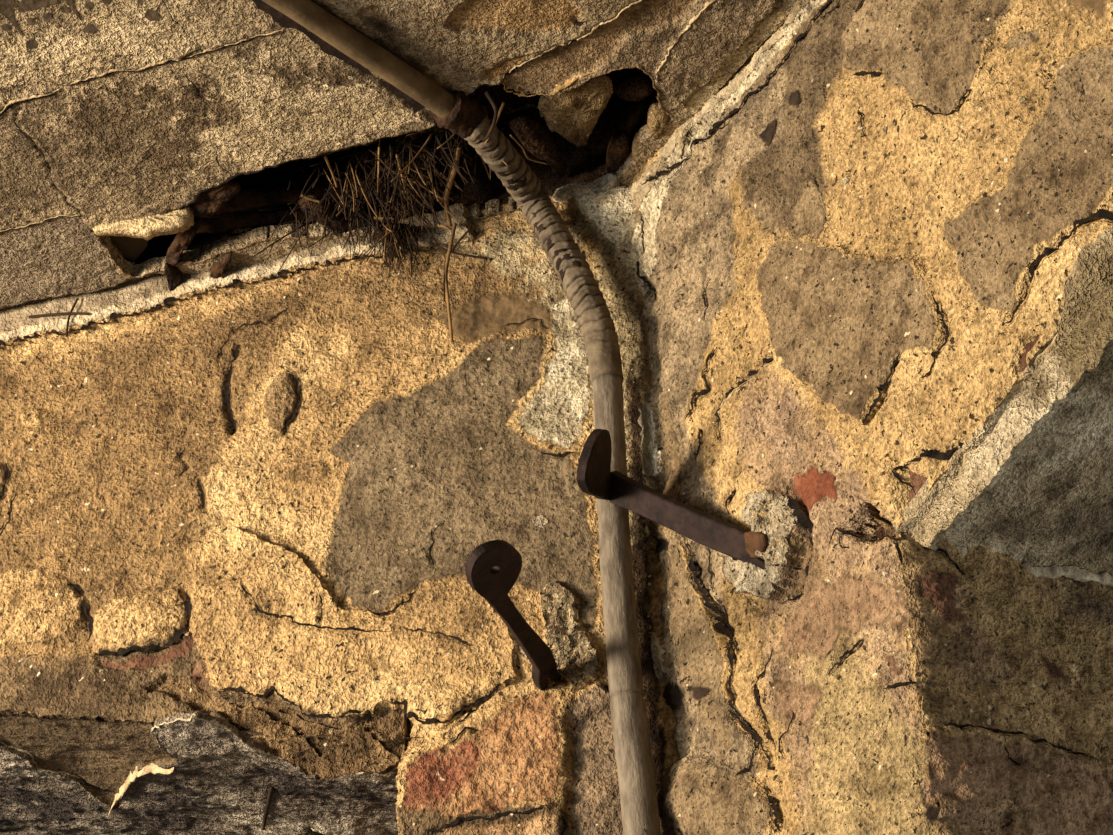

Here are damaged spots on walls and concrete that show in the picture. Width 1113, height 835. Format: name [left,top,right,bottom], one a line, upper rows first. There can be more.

crack [0,0,283,232]
hole [164,123,449,219]
flaking render [756,177,936,420]
crack [920,292,950,378]
crack [1003,209,1113,326]
flaking render [656,393,682,501]
spalling [854,502,907,542]
crack [892,437,983,495]
crack [68,583,192,657]
flaking render [0,526,516,835]
flaking render [646,518,735,758]
crack [675,535,794,832]